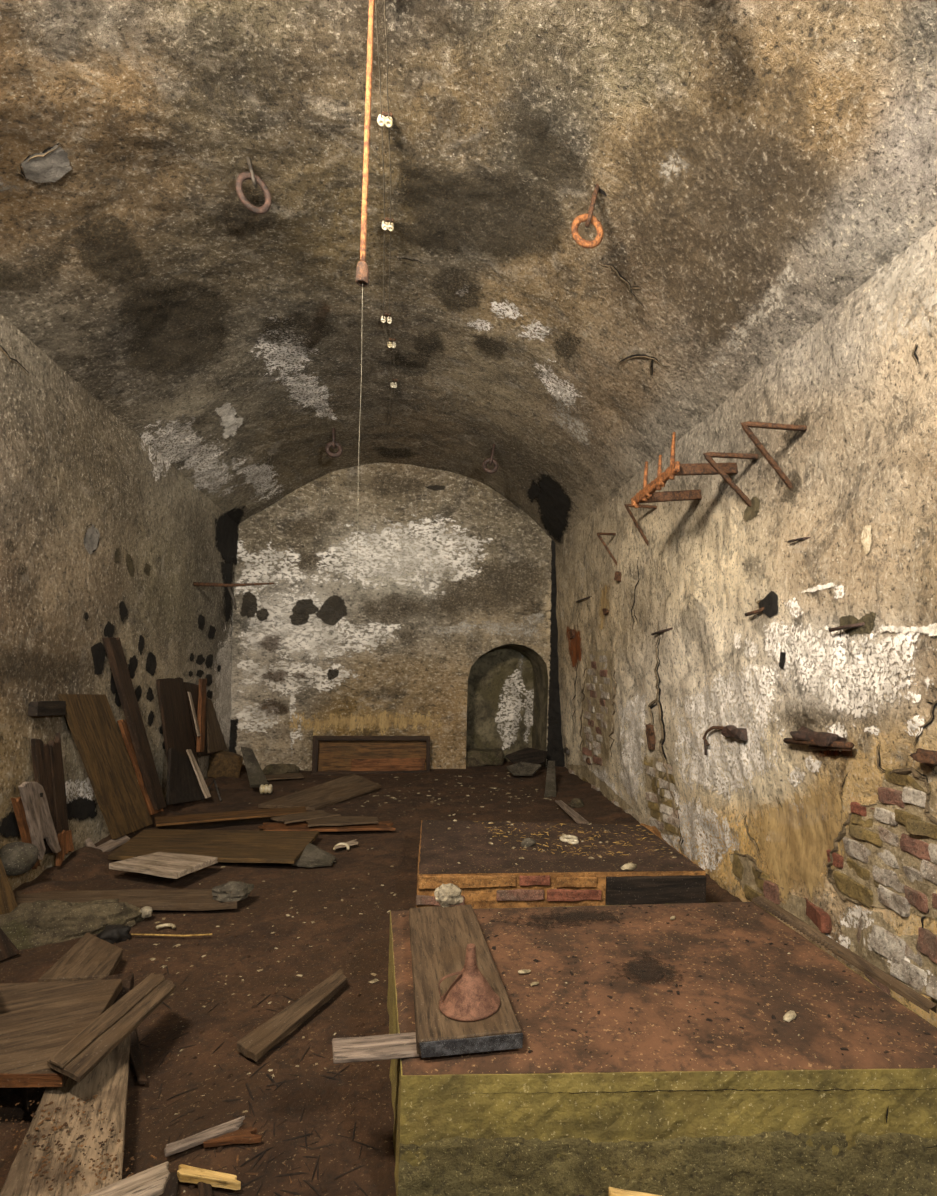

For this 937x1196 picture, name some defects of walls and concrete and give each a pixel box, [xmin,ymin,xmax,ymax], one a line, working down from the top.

crack [0,345,29,376]
water stain [0,215,227,379]
water stain [248,303,339,421]
water stain [387,331,444,368]
water stain [391,102,590,255]
water stain [428,267,590,445]
water stain [620,69,829,378]
water stain [136,414,282,502]
water stain [213,513,546,759]
water stain [591,597,937,904]
flaking render [730,768,937,1000]